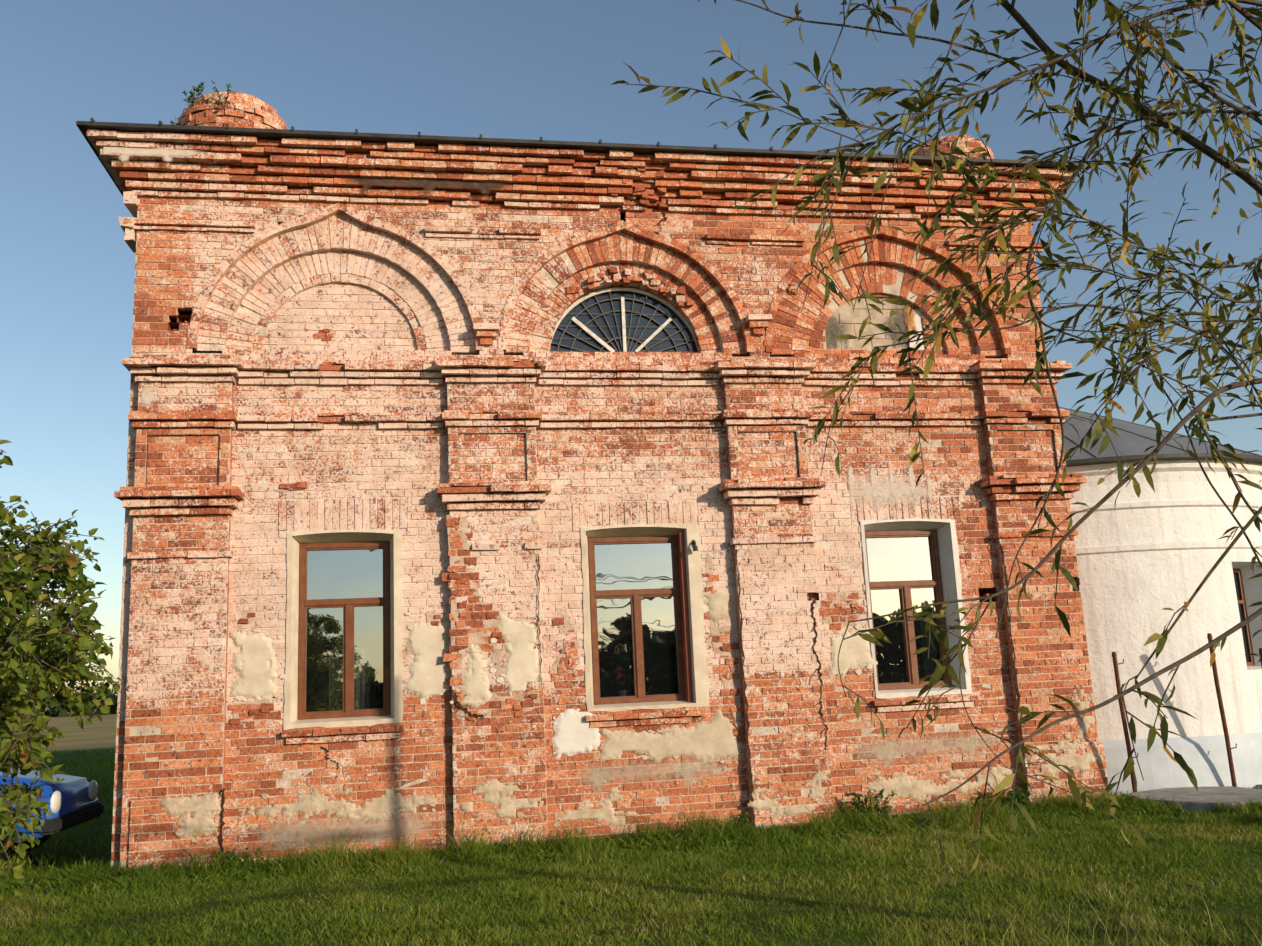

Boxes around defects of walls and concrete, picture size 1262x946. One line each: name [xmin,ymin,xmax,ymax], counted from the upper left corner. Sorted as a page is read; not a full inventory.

spalling [168,315,191,331]
spalling [399,515,746,764]
flaking render [807,592,878,677]
flaking render [229,609,286,728]
crack [809,600,828,750]
crack [451,689,484,719]
flaking render [161,792,221,842]
flaking render [239,785,437,831]
flaking render [460,779,544,828]
flaking render [553,779,638,832]